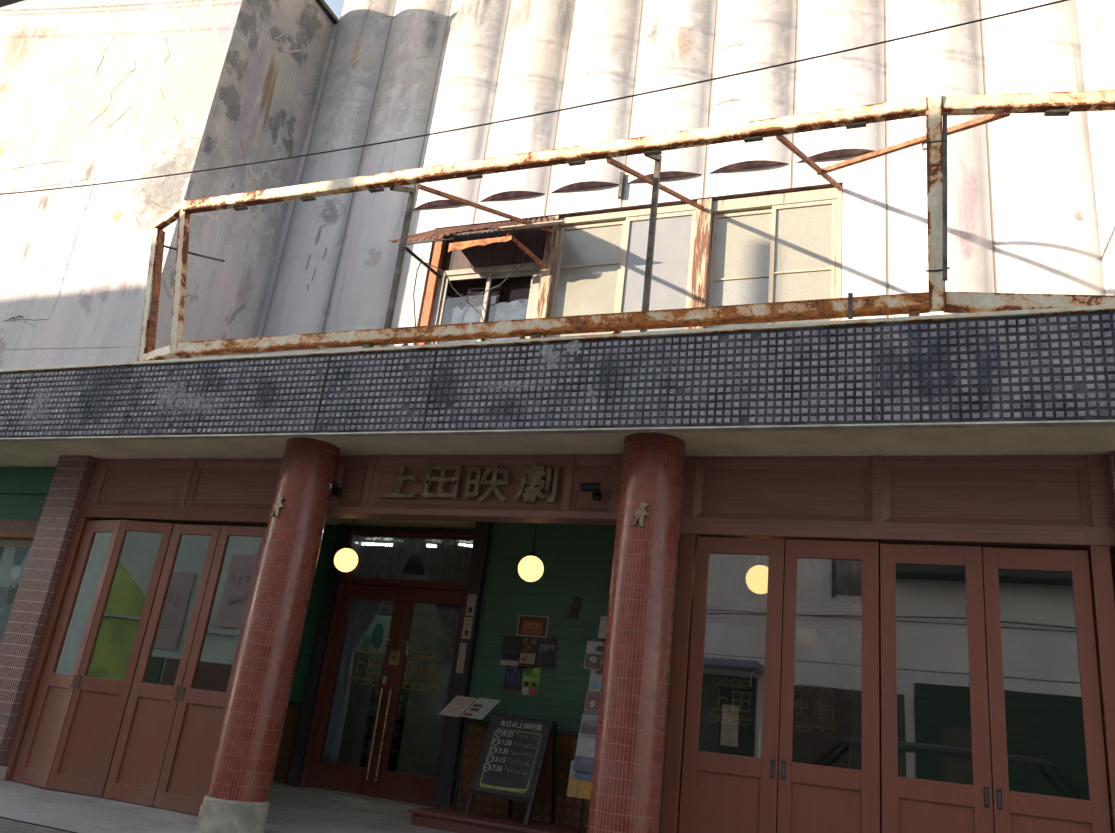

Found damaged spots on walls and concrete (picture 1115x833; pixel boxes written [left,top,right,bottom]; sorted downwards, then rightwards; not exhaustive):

crack [0,0,170,349]
crack [129,155,192,232]